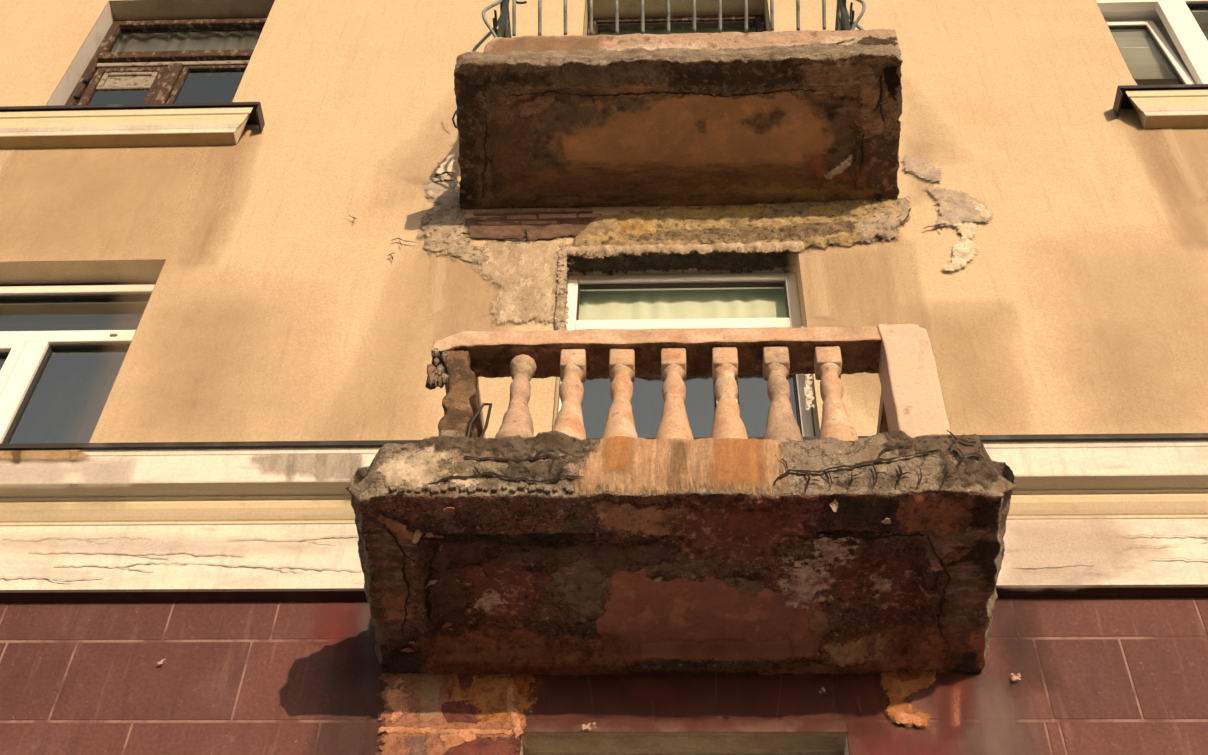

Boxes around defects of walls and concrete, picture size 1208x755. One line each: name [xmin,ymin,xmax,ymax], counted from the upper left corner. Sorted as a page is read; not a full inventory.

damp [454,37,900,207]
crack [859,75,886,176]
spalling [416,155,912,330]
peeling [902,154,994,272]
spalling [375,431,594,494]
crack [774,430,984,489]
peeling [363,514,444,653]
crack [387,527,609,633]
peeling [455,498,849,661]
peeling [853,430,1003,668]
peeling [373,663,543,755]
peeling [879,669,937,727]